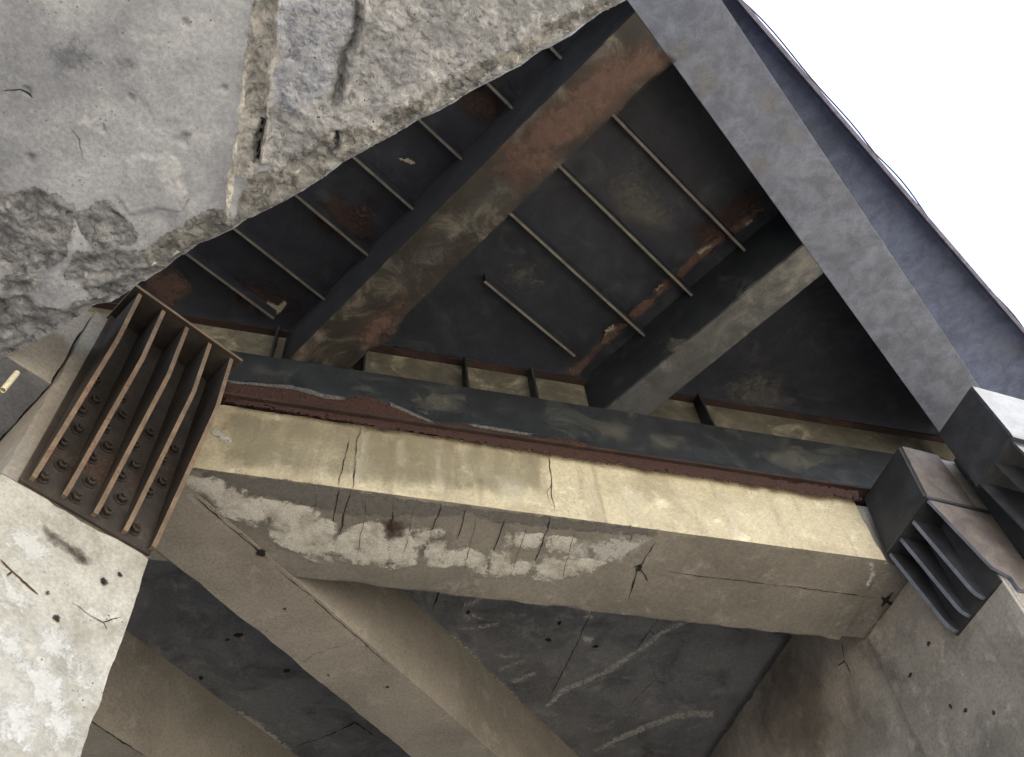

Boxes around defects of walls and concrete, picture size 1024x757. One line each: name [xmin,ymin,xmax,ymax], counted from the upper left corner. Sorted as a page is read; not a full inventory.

corrosion [461,87,500,122]
corrosion [493,41,675,189]
spalling [0,0,622,358]
crack [333,428,361,534]
damp [185,468,657,582]
crack [422,503,466,555]
crack [527,459,555,576]
corrosion [223,380,862,502]
crack [628,534,871,598]